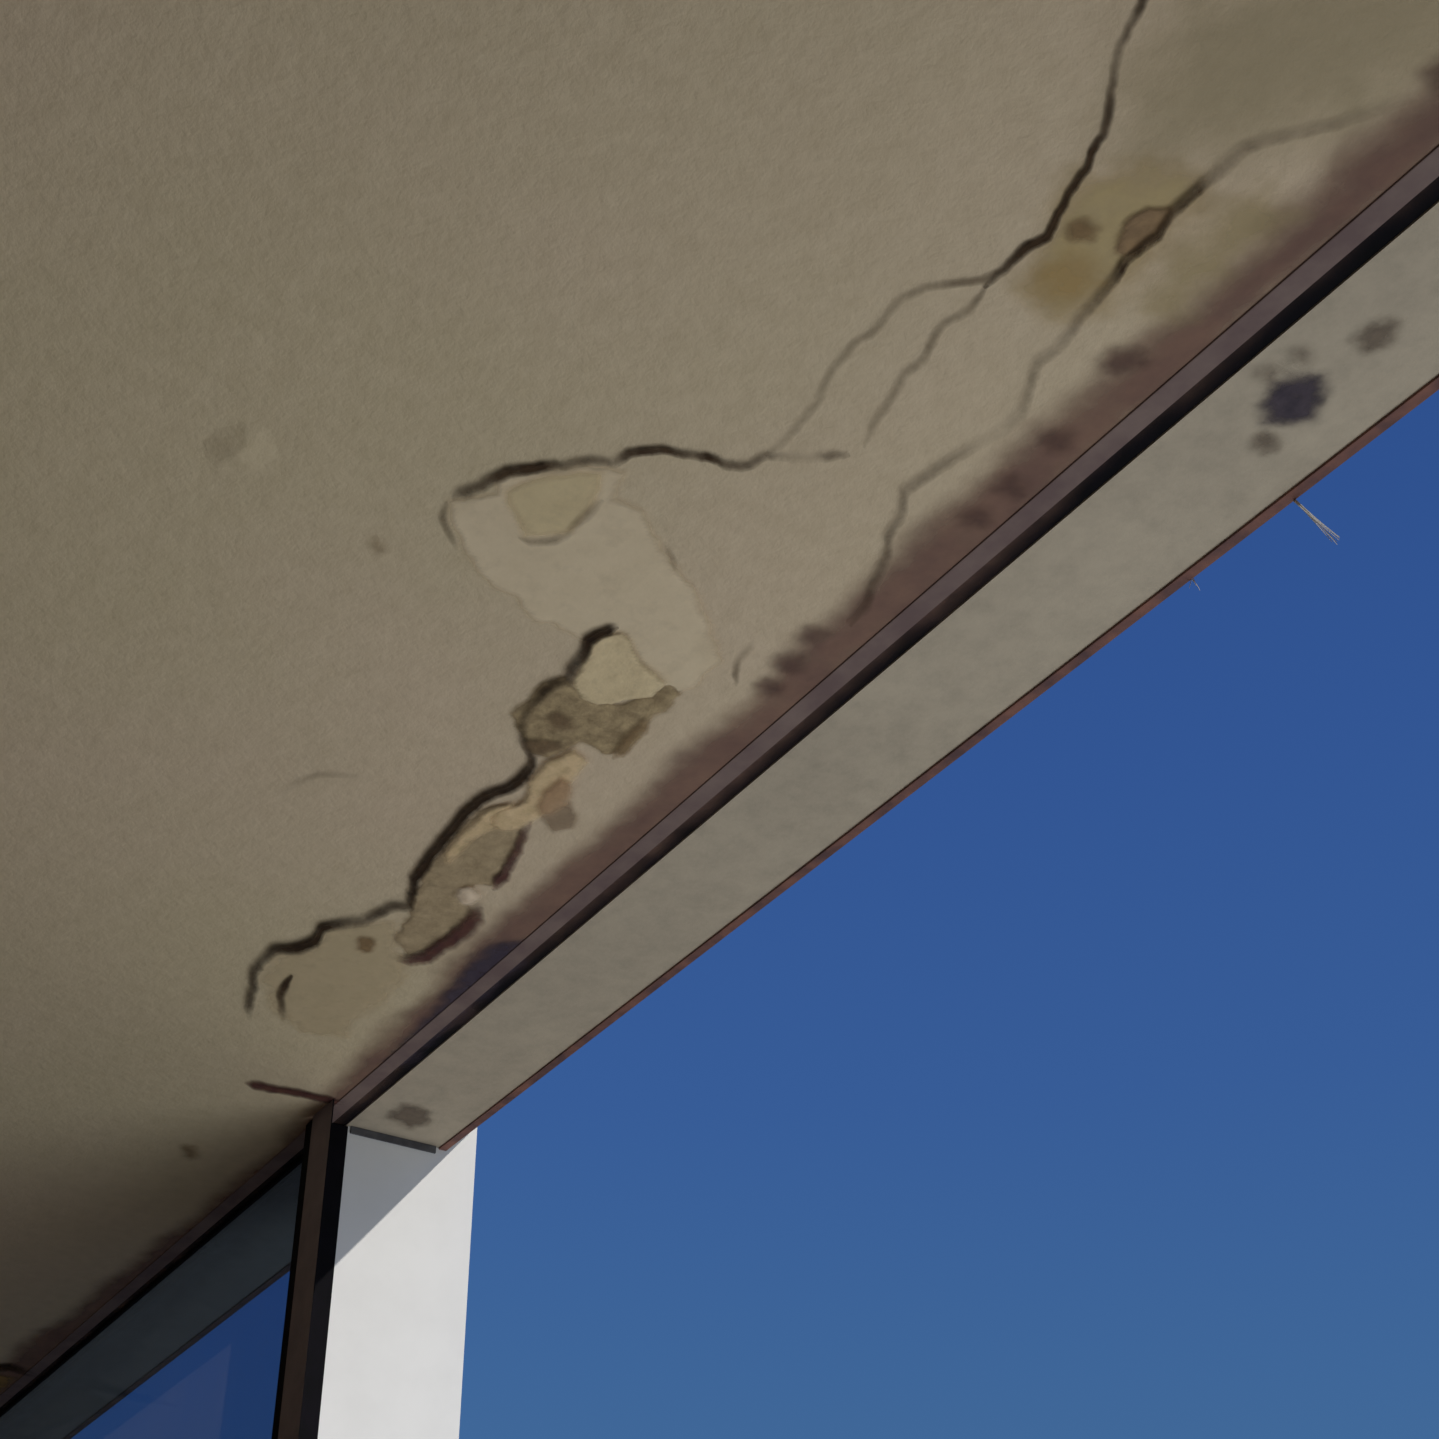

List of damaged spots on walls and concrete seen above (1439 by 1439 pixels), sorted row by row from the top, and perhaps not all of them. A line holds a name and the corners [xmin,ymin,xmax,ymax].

crack [1125,0,1146,37]
crack [954,85,1115,285]
crack [1096,182,1208,304]
crack [460,447,762,496]
peeling [268,467,721,1035]
crack [536,627,619,703]
leakage [286,68,1439,1146]
crack [246,748,536,1010]
leakage [0,1162,268,1395]